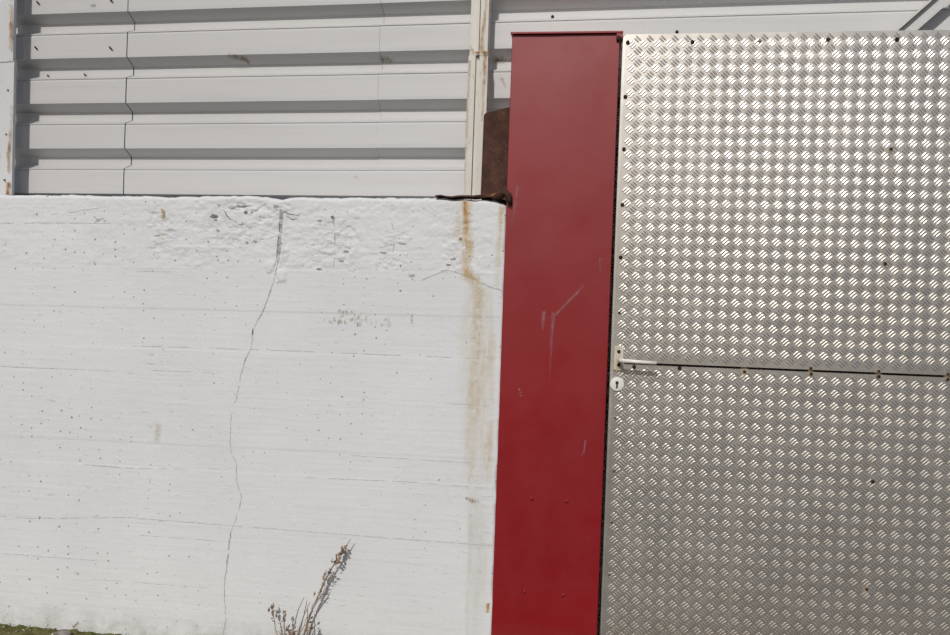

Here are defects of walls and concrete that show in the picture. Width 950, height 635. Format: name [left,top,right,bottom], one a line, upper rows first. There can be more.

crack [223,210,299,635]
rust [463,201,479,291]